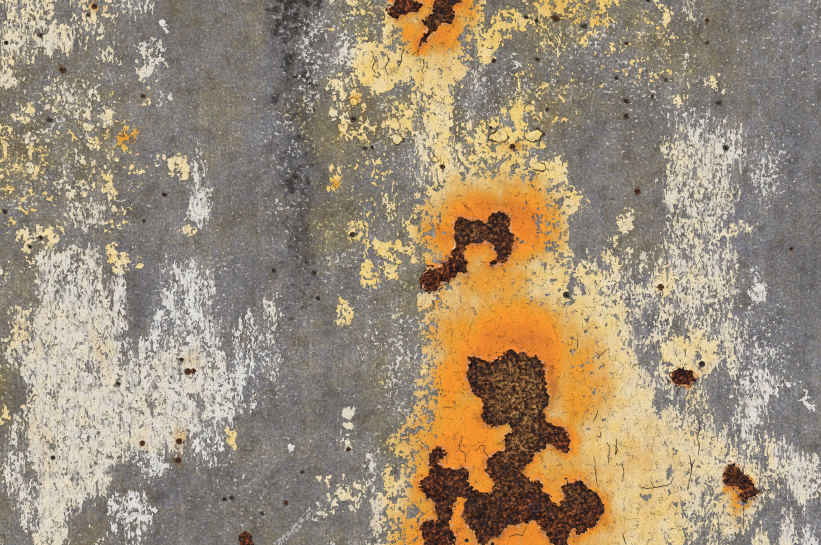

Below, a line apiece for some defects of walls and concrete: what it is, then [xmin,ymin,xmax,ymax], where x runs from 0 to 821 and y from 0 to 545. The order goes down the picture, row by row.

rust [384,0,478,57]
peeling [0,0,282,545]
peeling [309,0,821,545]
rust [392,178,616,545]
rust [668,366,697,389]
rust [721,461,761,515]
rust [238,531,254,545]